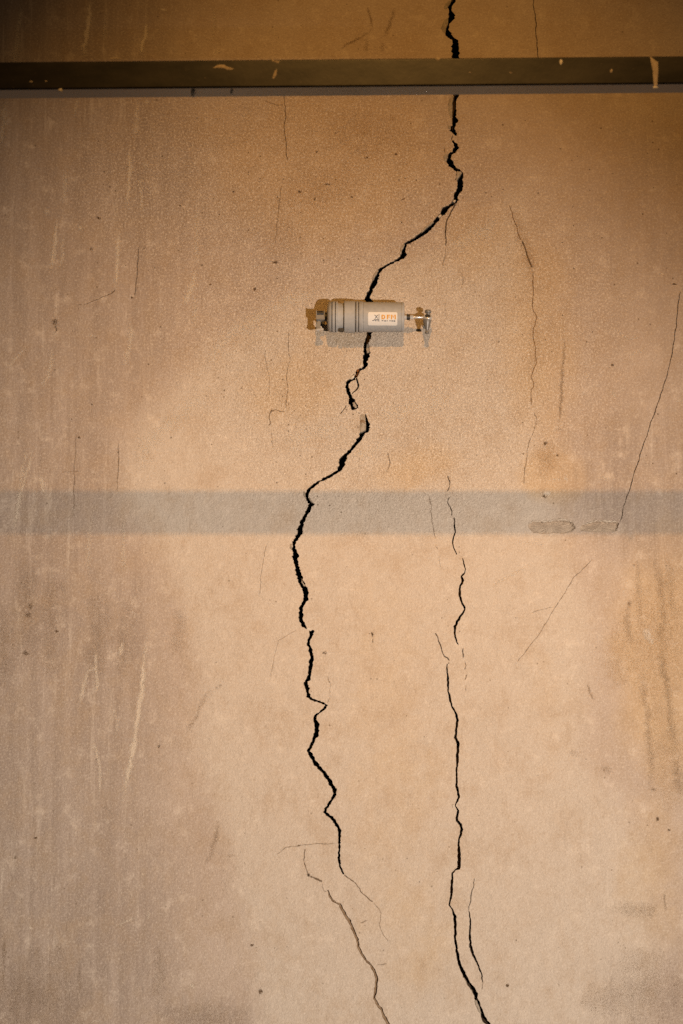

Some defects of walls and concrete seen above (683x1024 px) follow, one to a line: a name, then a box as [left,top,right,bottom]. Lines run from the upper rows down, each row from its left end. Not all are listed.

crack [441,0,460,58]
crack [364,95,464,302]
crack [620,294,680,521]
crack [290,332,390,1024]
crack [429,477,491,1024]